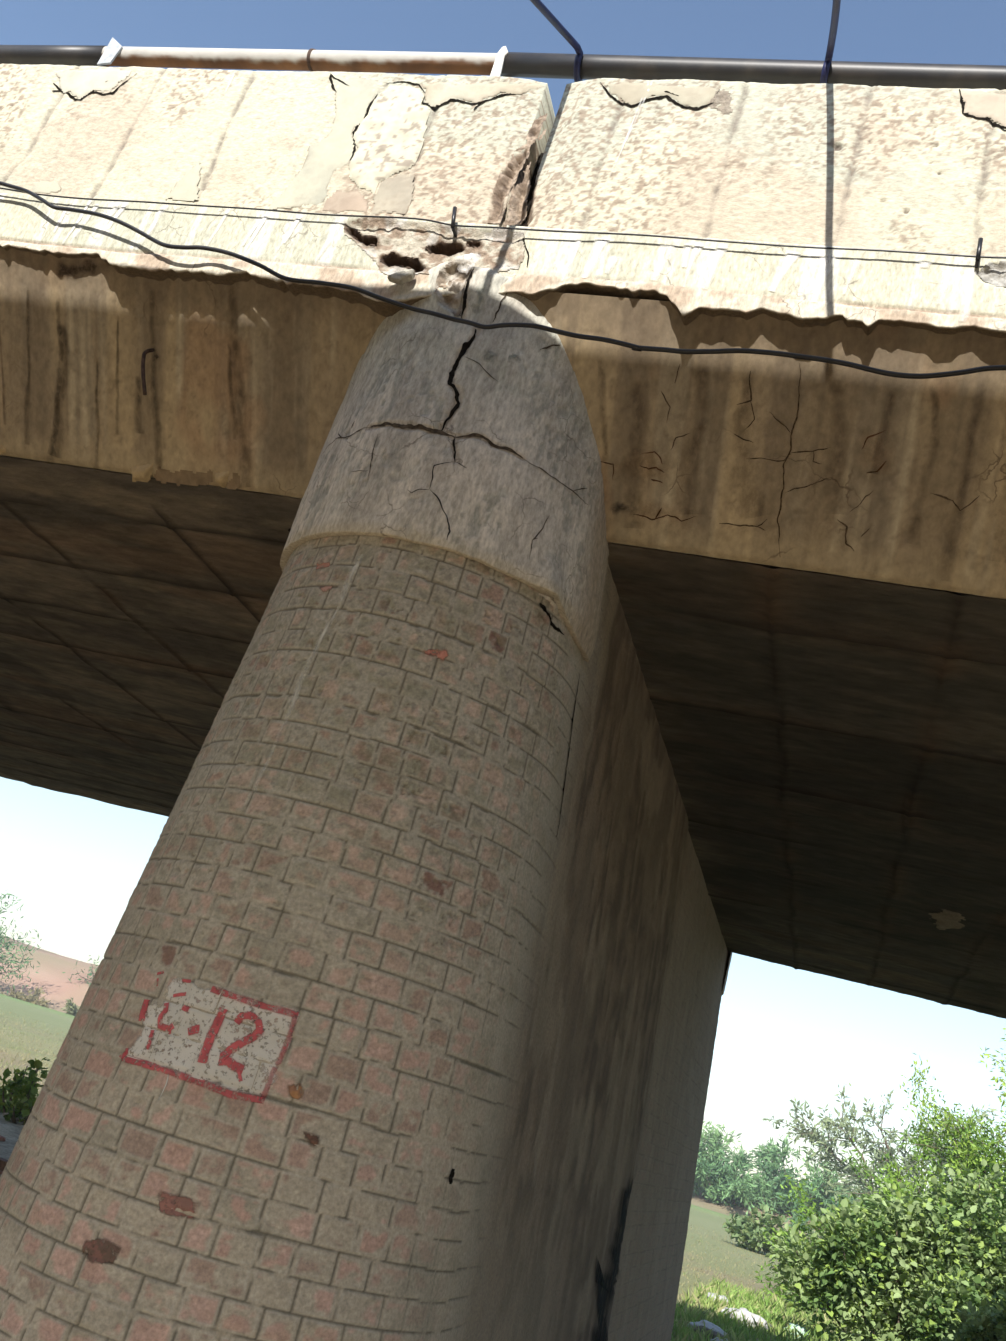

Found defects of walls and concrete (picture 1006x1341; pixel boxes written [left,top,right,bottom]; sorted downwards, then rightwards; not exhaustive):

peeling [55,68,131,99]
peeling [604,81,733,114]
peeling [959,91,1006,127]
peeling [269,76,542,210]
spalling [344,113,547,316]
water stain [58,261,97,275]
spalling [978,261,1006,287]
crack [322,269,832,554]
crack [838,430,886,551]
crack [931,493,980,511]
spalling [929,909,966,930]